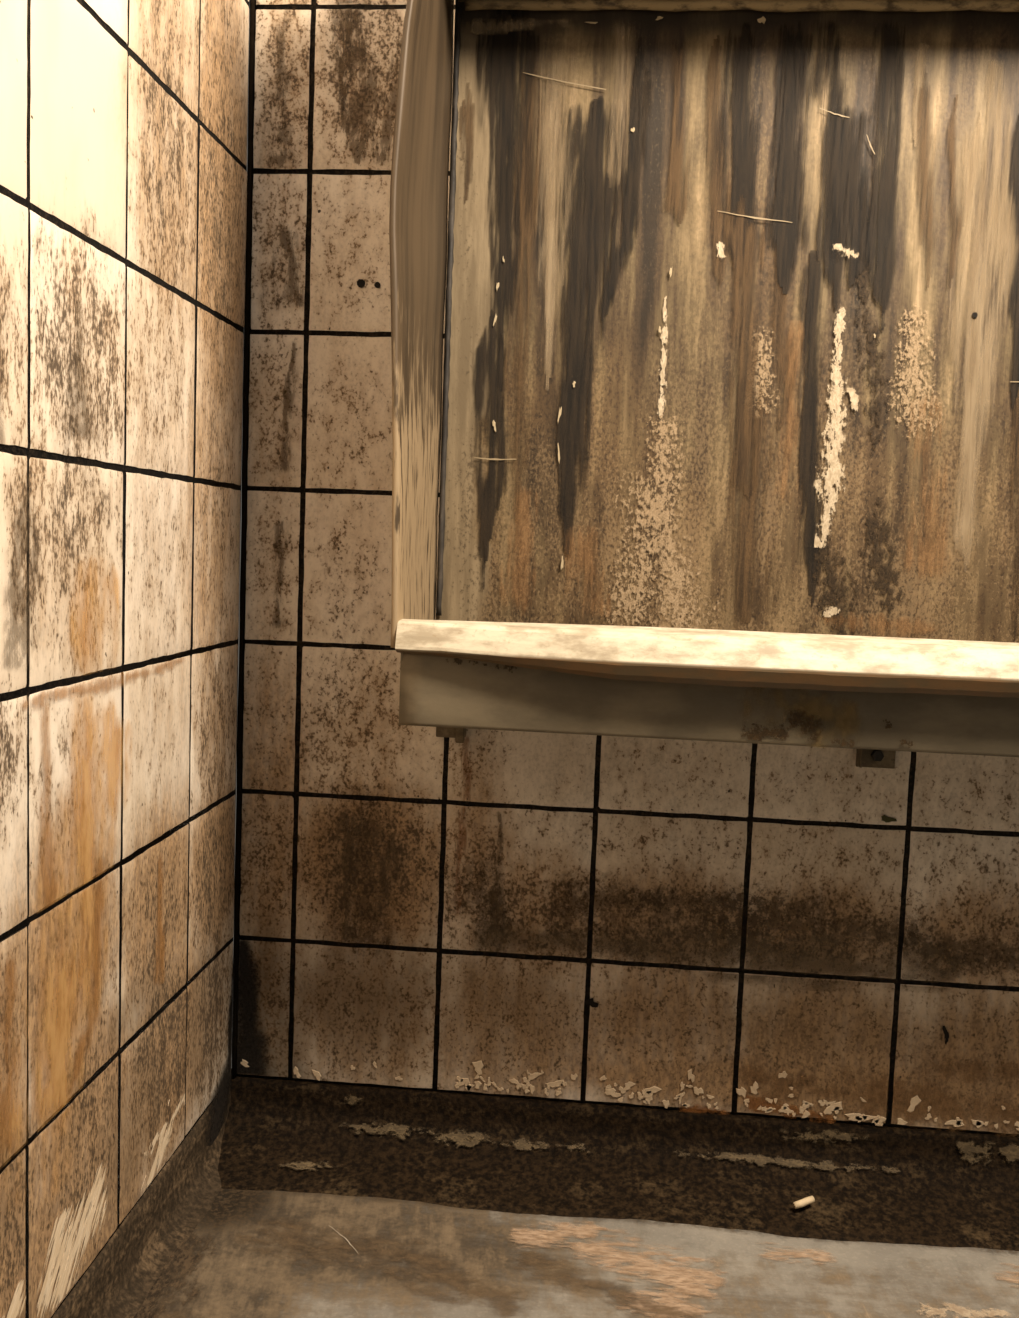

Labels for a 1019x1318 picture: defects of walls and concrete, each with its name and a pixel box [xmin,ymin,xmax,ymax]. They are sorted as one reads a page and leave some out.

damp [332,0,402,163]
damp [280,343,295,470]
damp [460,9,652,590]
damp [614,22,933,636]
damp [947,60,1019,640]
corrosion [25,659,182,905]
corrosion [38,706,121,1116]
damp [461,870,1019,988]
spalling [455,1060,577,1096]
spalling [600,1069,719,1110]
peeling [675,1151,901,1173]
spalling [736,1071,1019,1163]